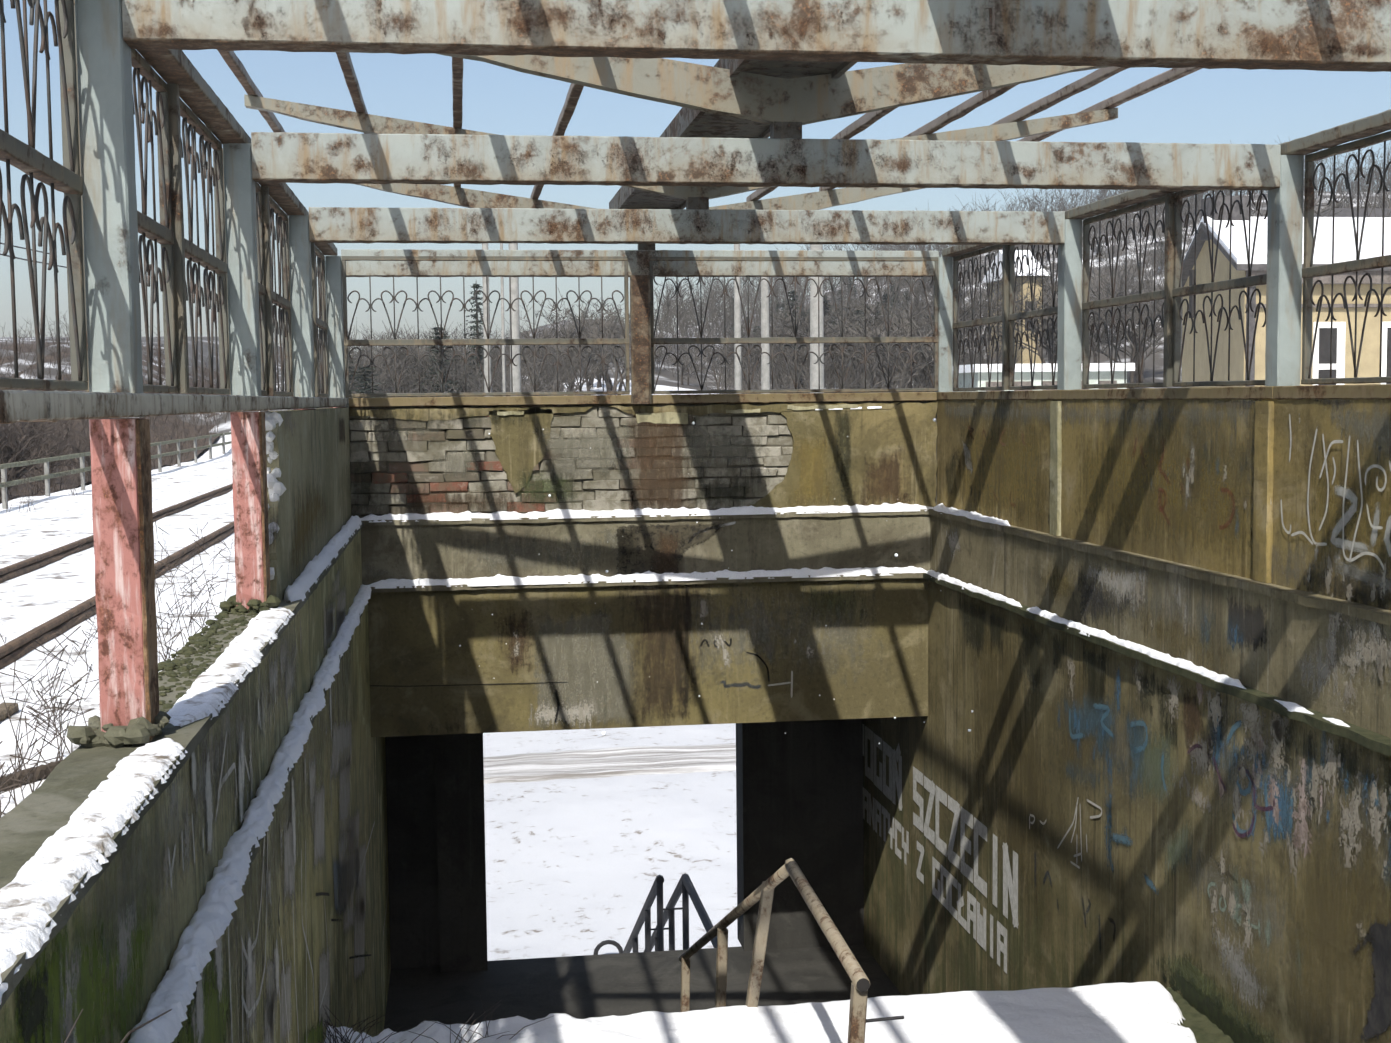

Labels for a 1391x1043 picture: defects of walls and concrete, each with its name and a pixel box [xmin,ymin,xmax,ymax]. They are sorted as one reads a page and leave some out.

corrosion [245,0,271,37]
corrosion [371,0,415,33]
corrosion [508,0,567,33]
corrosion [588,0,695,38]
corrosion [1248,35,1384,56]
corrosion [713,139,806,182]
corrosion [879,156,933,172]
corrosion [1013,166,1036,179]
corrosion [807,219,847,240]
spalling [349,404,858,575]
flaking render [1307,544,1391,712]
peeling [1165,675,1391,1008]